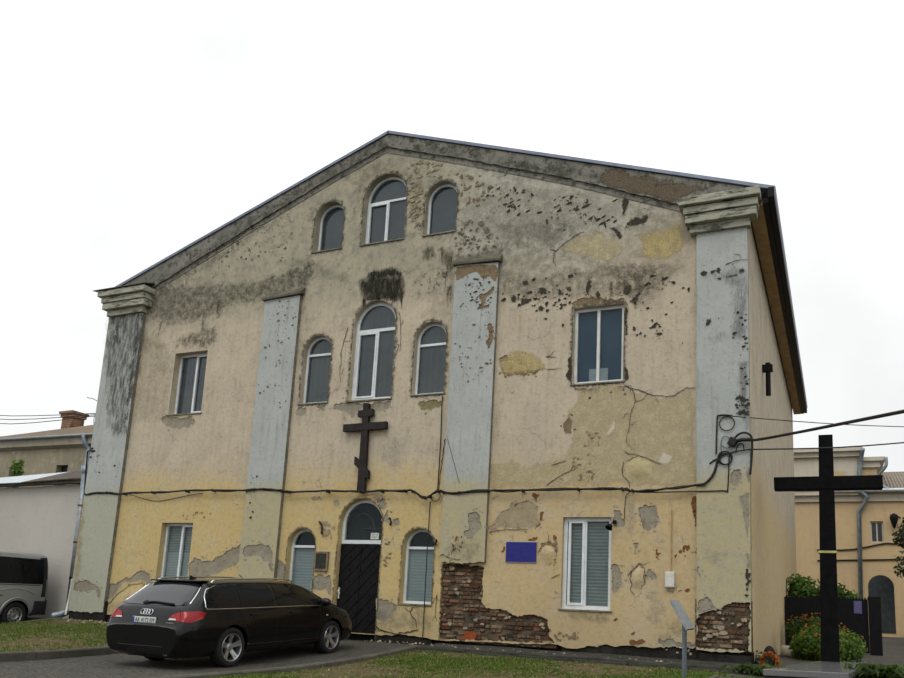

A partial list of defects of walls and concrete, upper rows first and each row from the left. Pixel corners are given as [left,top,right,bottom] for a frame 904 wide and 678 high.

spalling [407,160,702,382]
damp [104,265,309,435]
damp [346,268,404,403]
peeling [491,355,697,488]
crack [622,385,688,488]
peeling [735,367,751,415]
spalling [73,567,153,599]
spalling [188,540,277,579]
spalling [376,594,397,624]
spalling [437,564,579,649]
spalling [633,502,661,533]
spalling [655,552,753,655]